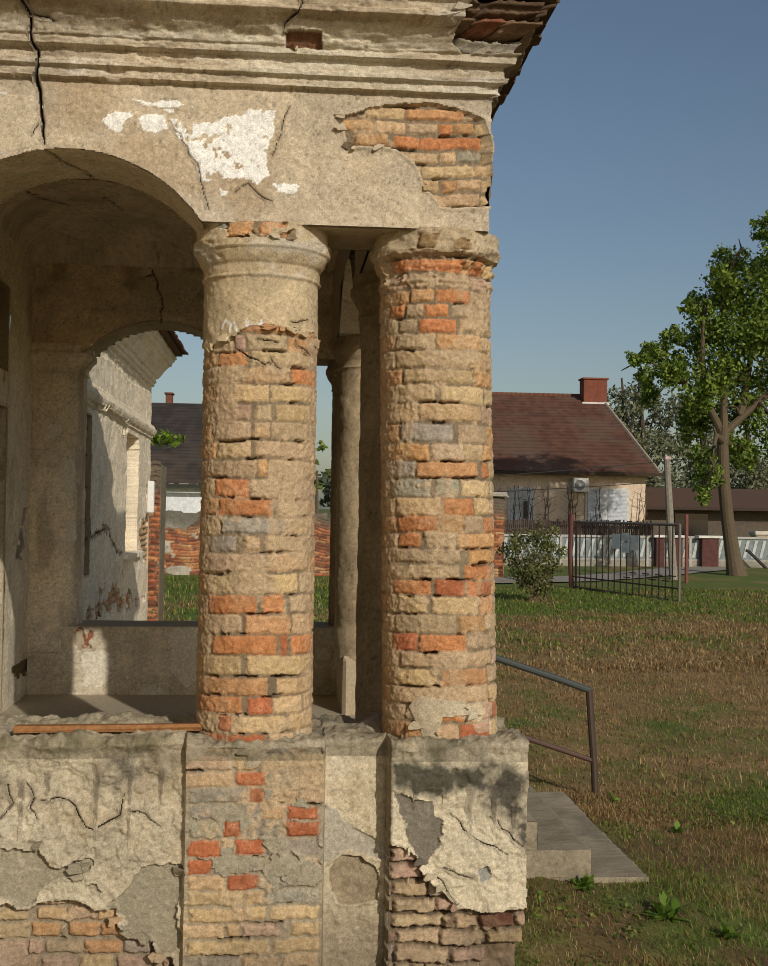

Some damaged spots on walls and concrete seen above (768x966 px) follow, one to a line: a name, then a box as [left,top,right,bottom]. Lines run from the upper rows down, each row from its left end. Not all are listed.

crack [282,0,304,36]
flaking render [429,0,556,54]
crack [18,0,122,210]
peeling [103,98,300,195]
flaking render [333,102,493,208]
flaking render [374,233,498,739]
crack [84,524,133,602]
flaking render [0,318,525,966]
crack [0,781,161,834]